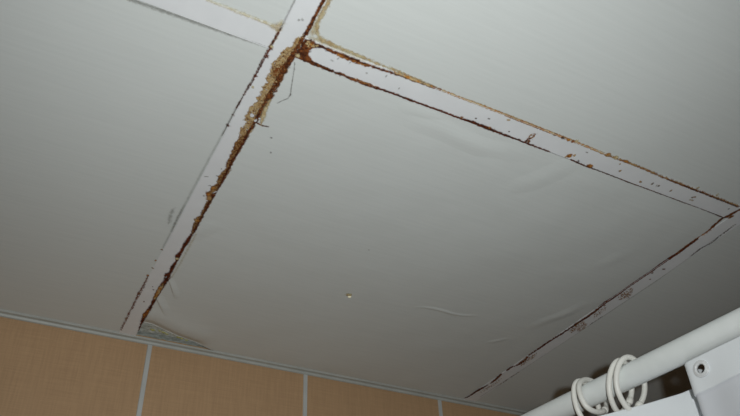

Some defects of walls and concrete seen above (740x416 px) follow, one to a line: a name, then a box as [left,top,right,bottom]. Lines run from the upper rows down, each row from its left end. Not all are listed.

corrosion [138,0,740,398]